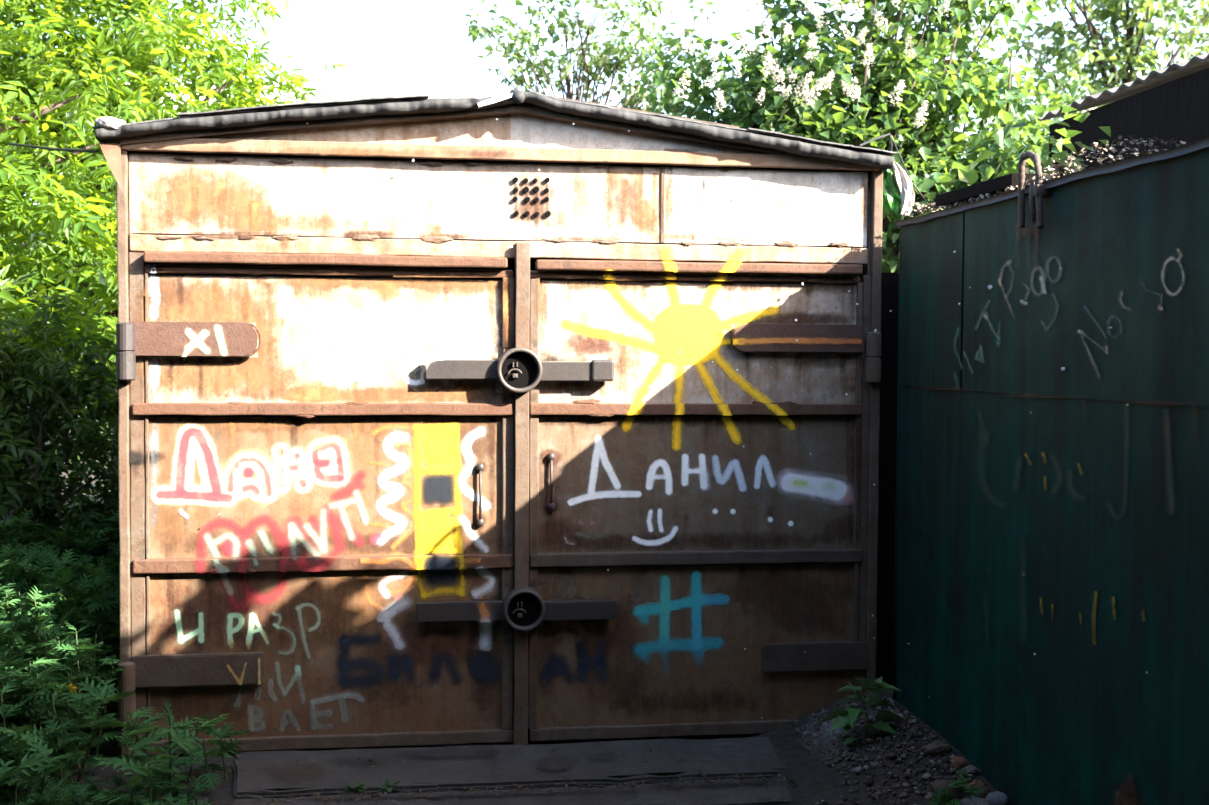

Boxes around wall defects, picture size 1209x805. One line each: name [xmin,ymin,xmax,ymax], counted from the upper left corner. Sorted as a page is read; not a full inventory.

corrosion [142,169,330,241]
corrosion [344,221,390,237]
corrosion [432,226,464,239]
corrosion [606,167,704,240]